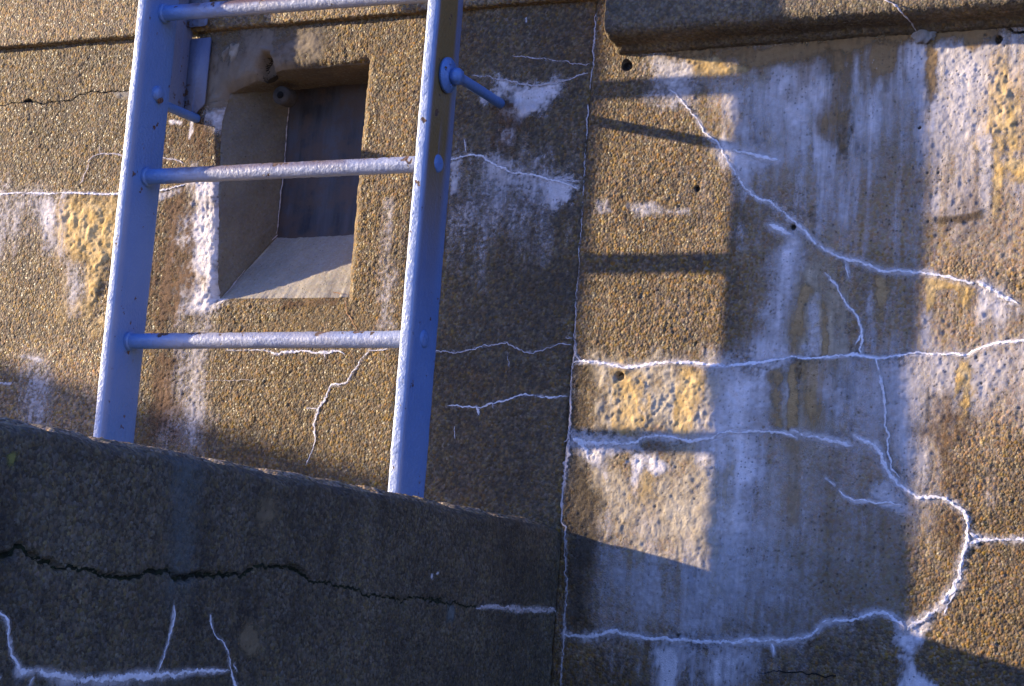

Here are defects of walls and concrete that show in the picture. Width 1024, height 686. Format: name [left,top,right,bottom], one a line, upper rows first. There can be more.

crack [0,90,128,106]
damp [52,195,117,337]
efflorescence [159,182,226,315]
crack [272,108,289,240]
damp [662,34,913,144]
damp [768,235,859,449]
crack [669,89,1018,305]
damp [925,276,972,312]
damp [928,28,1024,222]
crack [0,141,1024,686]
damp [574,347,754,686]